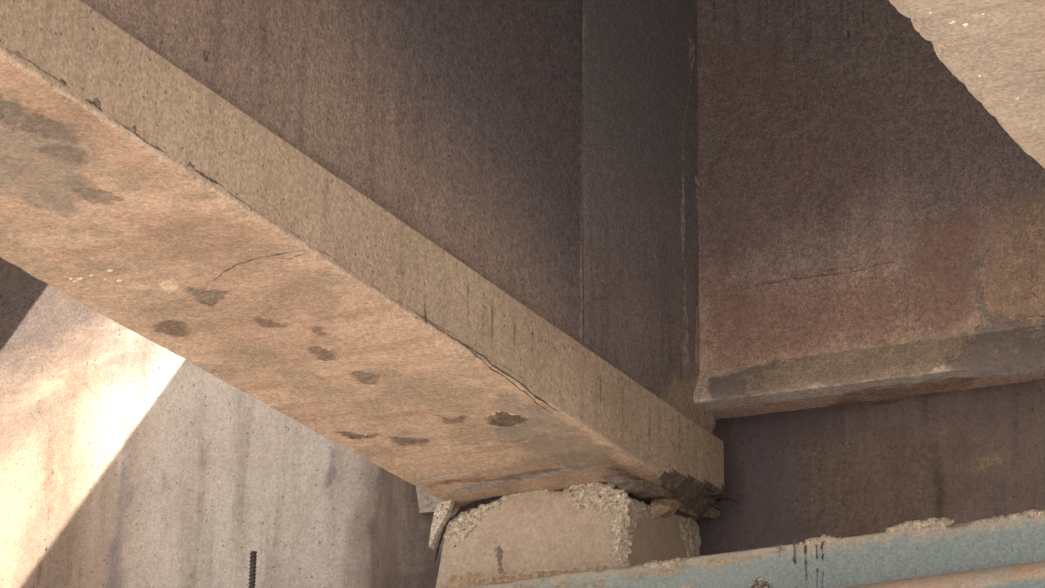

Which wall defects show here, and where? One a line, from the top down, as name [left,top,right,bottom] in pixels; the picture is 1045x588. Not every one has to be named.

damp [0,99,90,213]
crack [216,249,312,279]
damp [660,84,1045,433]
spalling [428,474,739,588]